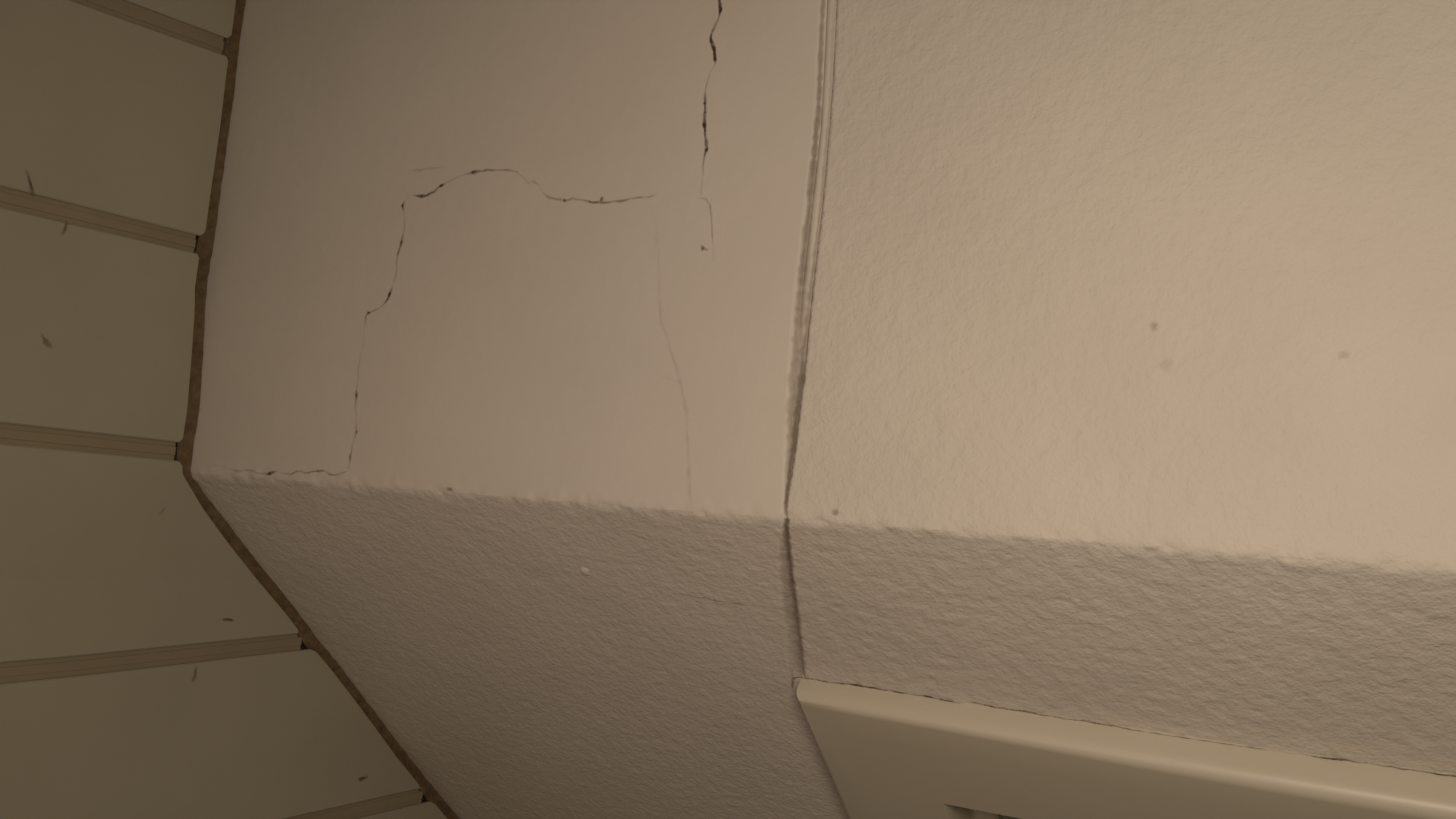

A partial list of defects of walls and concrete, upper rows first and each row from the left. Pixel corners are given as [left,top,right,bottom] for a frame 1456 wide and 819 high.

crack [710,0,722,61]
crack [701,101,709,153]